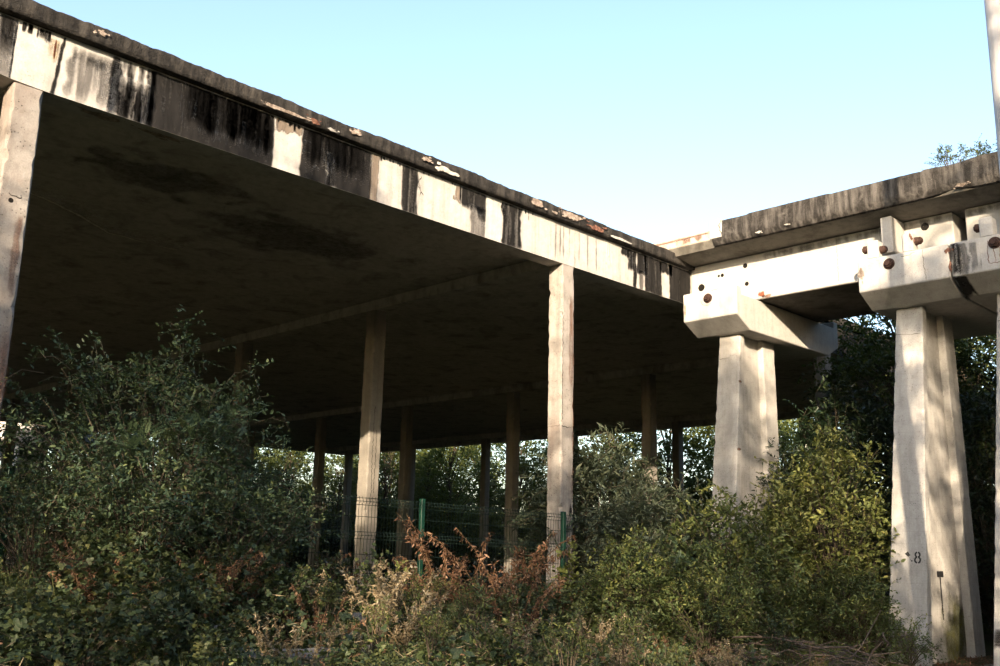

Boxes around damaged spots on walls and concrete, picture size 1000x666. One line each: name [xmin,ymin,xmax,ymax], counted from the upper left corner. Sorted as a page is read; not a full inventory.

damp [0,15,51,78]
damp [50,38,429,215]
spalling [422,156,460,177]
damp [442,179,486,237]
damp [501,202,534,248]
damp [621,247,691,303]